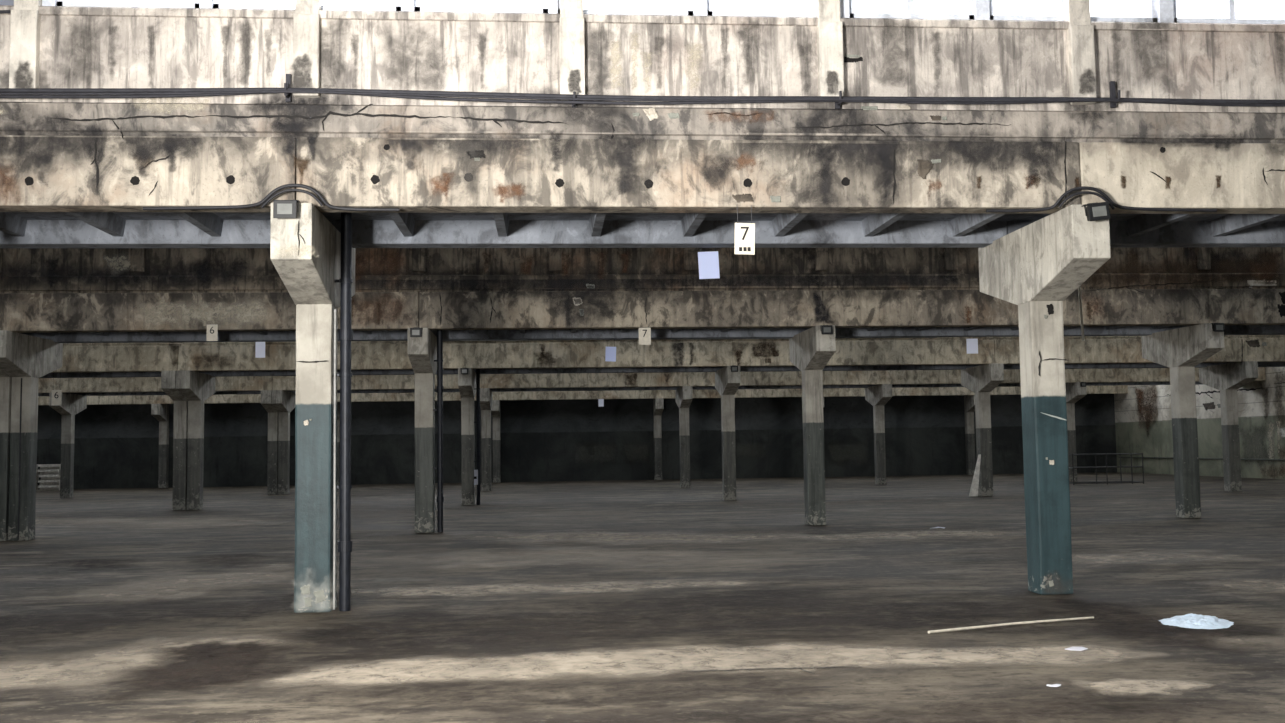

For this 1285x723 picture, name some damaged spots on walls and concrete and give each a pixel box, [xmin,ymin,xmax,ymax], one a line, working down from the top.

water stain [280,123,317,159]
water stain [36,156,52,181]
water stain [90,148,103,192]
water stain [614,138,636,192]
water stain [1024,153,1038,185]